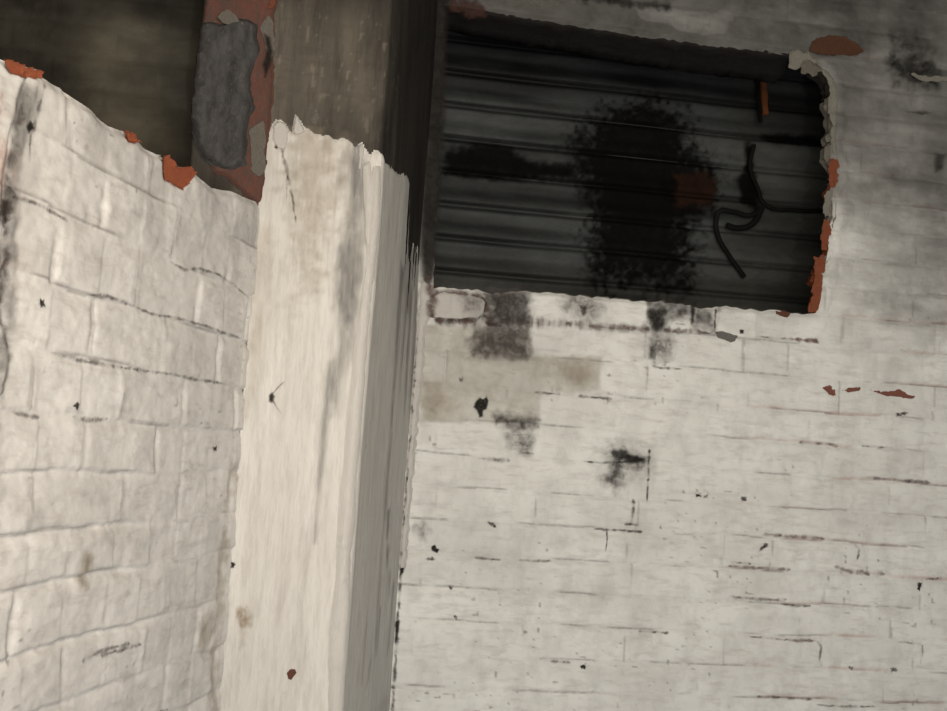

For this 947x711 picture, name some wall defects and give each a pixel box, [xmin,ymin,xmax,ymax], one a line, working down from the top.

spalling [4,58,44,79]
damp [911,73,947,82]
spalling [162,155,197,190]
spalling [788,35,864,315]
peeling [823,385,860,396]
peeling [874,389,915,399]